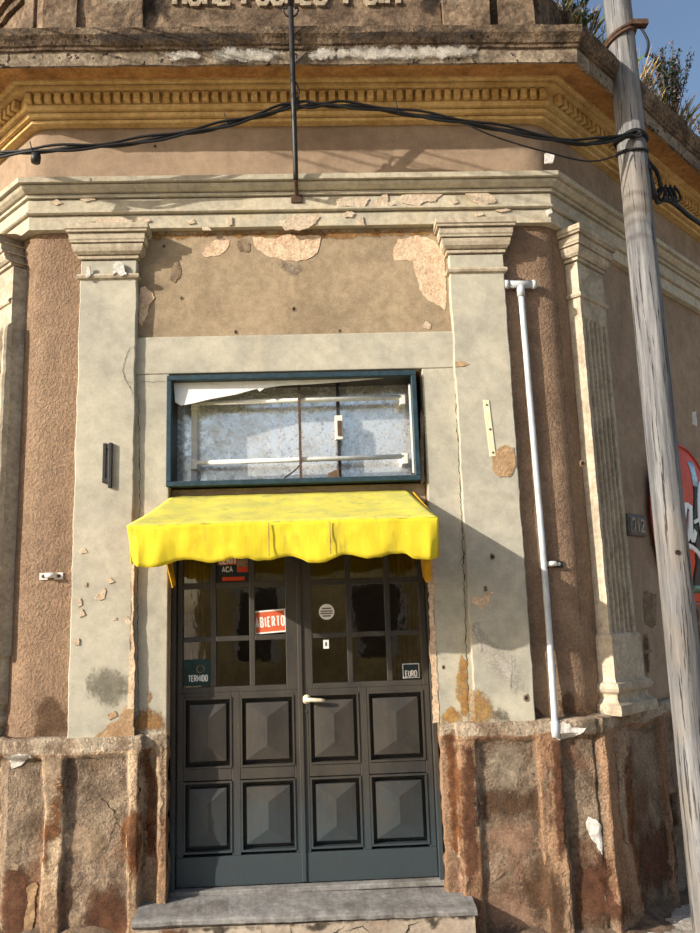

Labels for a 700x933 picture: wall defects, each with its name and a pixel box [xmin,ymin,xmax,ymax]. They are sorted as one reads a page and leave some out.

flaking render [187,214,322,275]
flaking render [393,235,447,310]
peeling [492,445,516,477]
leakage [442,655,507,723]
leakage [551,692,598,740]
leakage [0,762,29,933]
peeling [4,753,34,768]
leakage [41,755,67,869]
leakage [120,693,167,876]
flaking render [586,817,604,855]
leakage [83,882,127,933]
leakage [523,838,634,933]